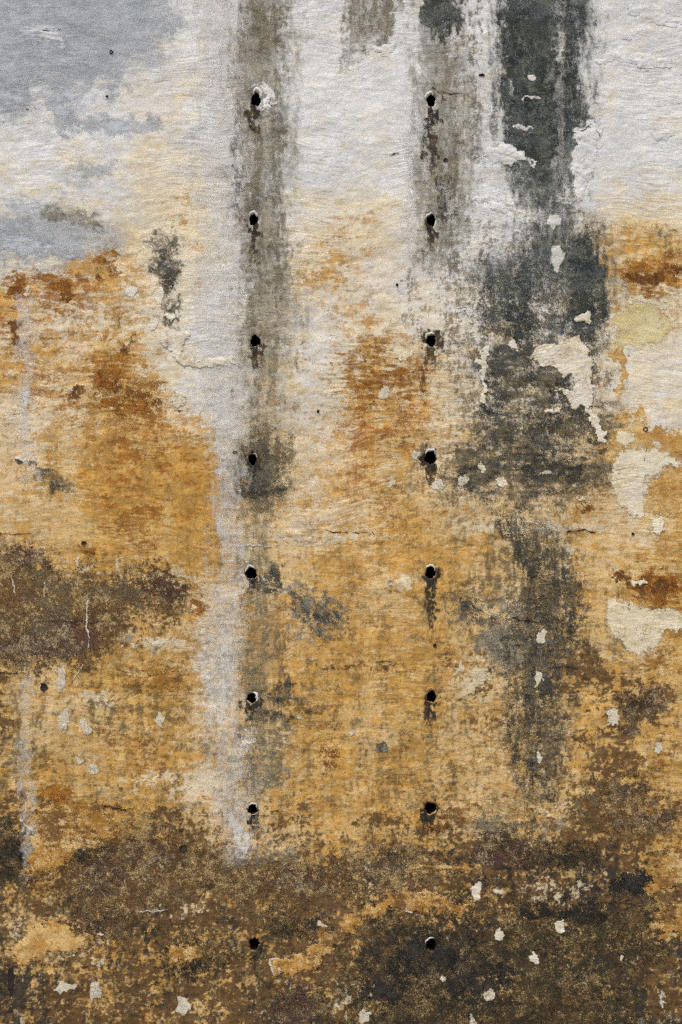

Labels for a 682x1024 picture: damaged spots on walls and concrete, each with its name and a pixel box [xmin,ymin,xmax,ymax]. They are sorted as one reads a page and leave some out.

corrosion [3,270,25,300]
leakage [145,227,184,333]
leakage [189,0,296,541]
peeling [574,310,591,325]
corrosion [617,258,682,299]
corrosion [61,334,162,408]
corrosion [328,338,428,413]
leakage [401,0,682,809]
peeling [508,335,682,535]
leakage [241,556,284,608]
peeling [605,596,682,654]
corrosion [609,568,682,610]